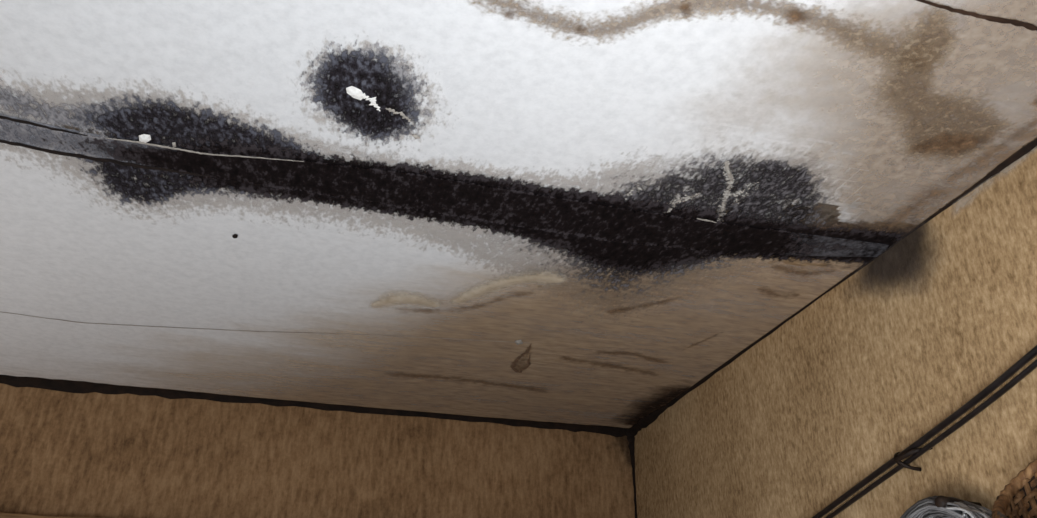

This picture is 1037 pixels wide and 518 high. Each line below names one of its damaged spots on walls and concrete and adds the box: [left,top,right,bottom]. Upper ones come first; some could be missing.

crack [916,0,1037,31]
peeling [346,86,411,122]
damp [0,0,1037,290]
damp [212,256,863,428]